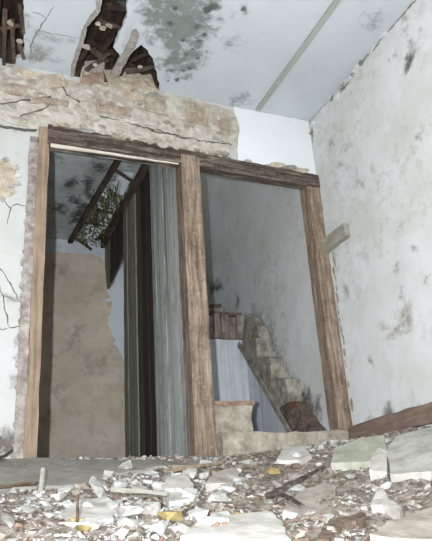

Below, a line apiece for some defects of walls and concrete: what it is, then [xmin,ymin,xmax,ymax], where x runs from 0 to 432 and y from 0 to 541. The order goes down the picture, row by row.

crack [29,7,79,64]
damp [141,0,220,79]
spalling [0,157,31,202]
damp [57,177,93,223]
crack [0,268,21,330]
peeling [37,244,125,458]